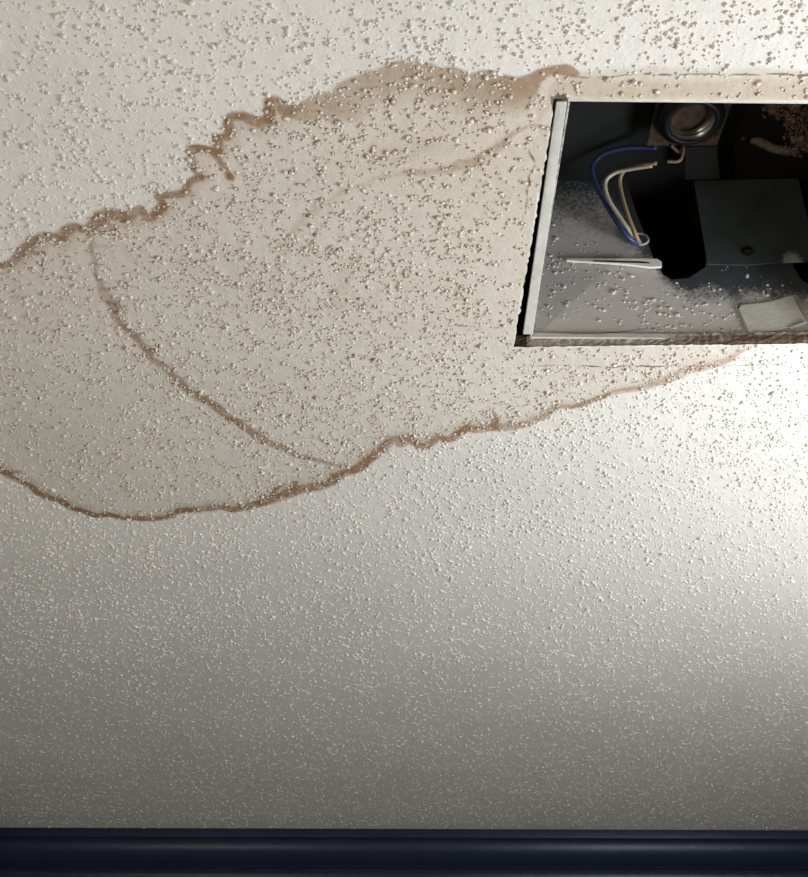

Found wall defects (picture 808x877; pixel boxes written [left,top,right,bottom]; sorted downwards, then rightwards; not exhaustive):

leakage [711,79,763,99]
leakage [780,75,808,100]
leakage [0,62,751,521]